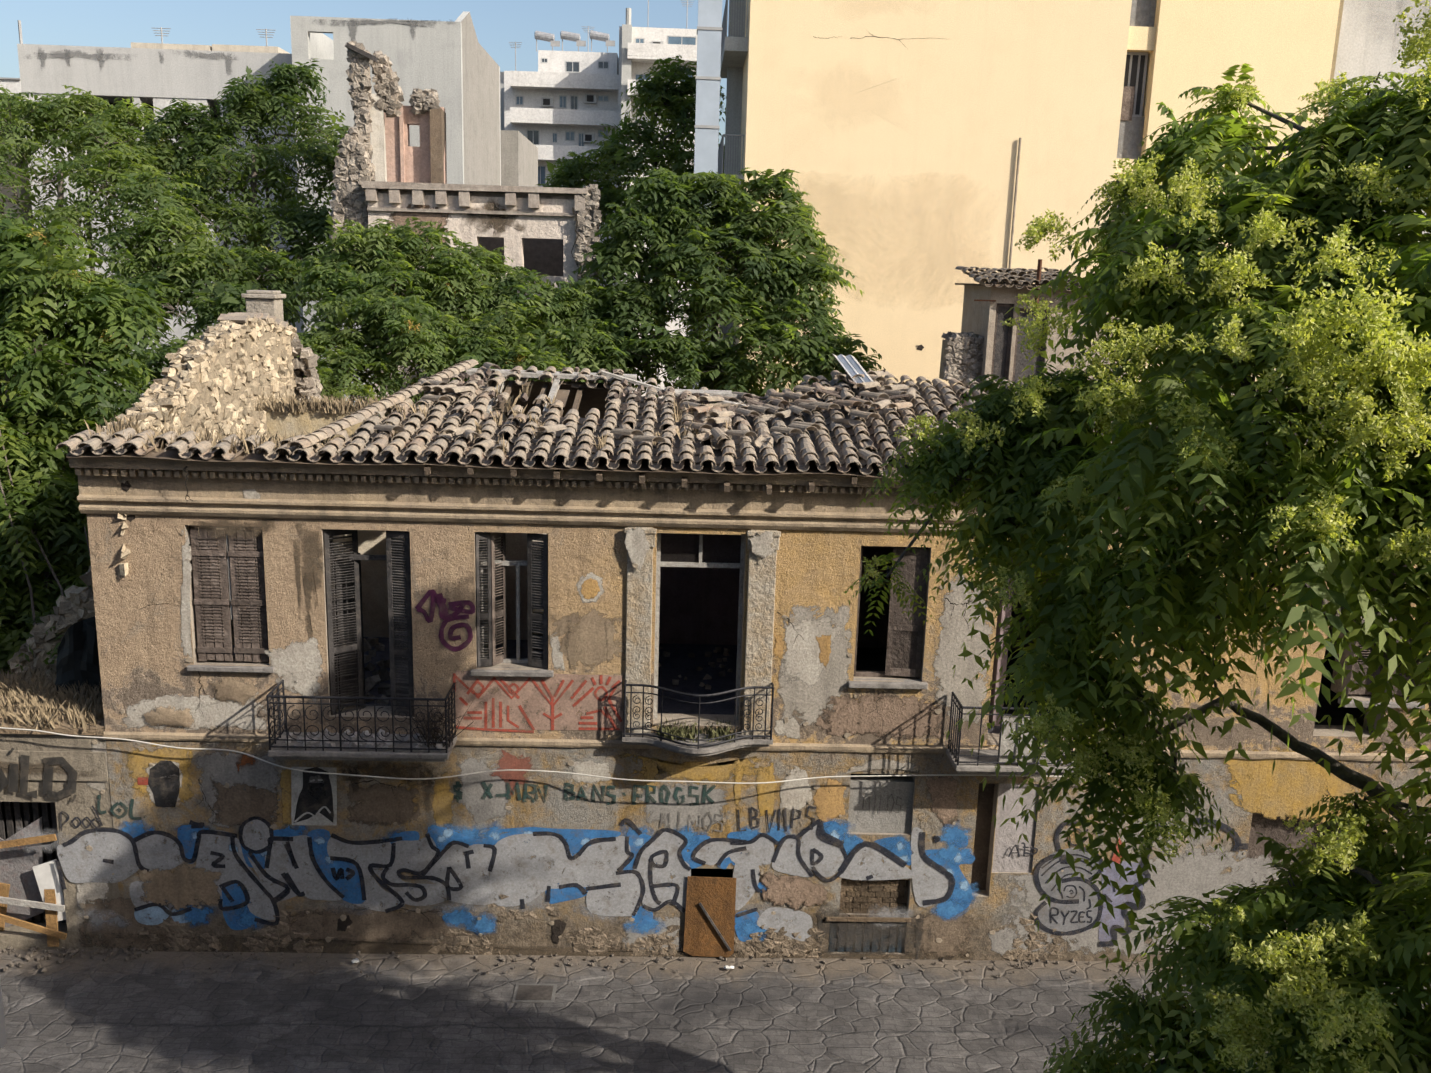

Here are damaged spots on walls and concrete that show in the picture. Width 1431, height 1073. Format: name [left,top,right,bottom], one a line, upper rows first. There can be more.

leakage [38,50,111,67]
leakage [186,51,231,73]
leakage [294,524,324,637]
flaking render [264,637,323,703]
flaking render [550,633,565,671]
flaking render [774,575,993,740]
flaking render [87,740,109,794]
flaking render [120,692,267,808]